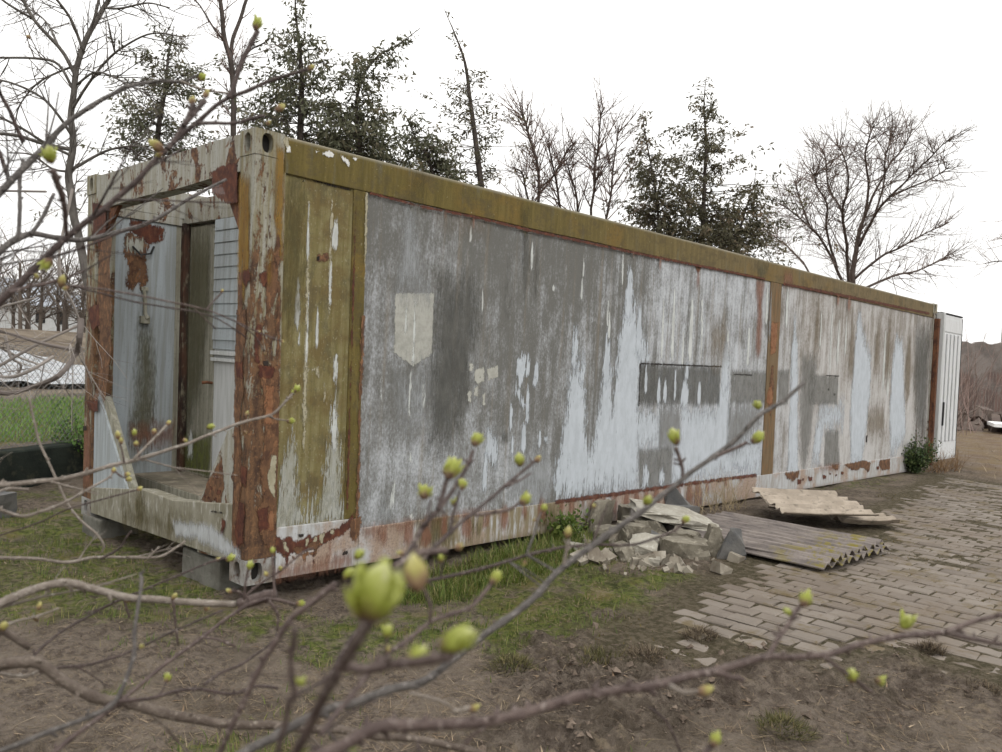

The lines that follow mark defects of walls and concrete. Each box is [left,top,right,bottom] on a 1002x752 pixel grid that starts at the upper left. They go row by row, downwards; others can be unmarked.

corrosion [86,203,166,412]
corrosion [202,147,386,575]
water stain [398,305,429,419]
water stain [522,211,533,280]
corrosion [370,192,778,354]
water stain [644,288,729,450]
water stain [815,302,854,376]
water stain [875,327,891,398]
water stain [728,405,760,453]
water stain [642,465,665,489]
corrosion [555,473,757,514]
corrosion [785,459,890,484]